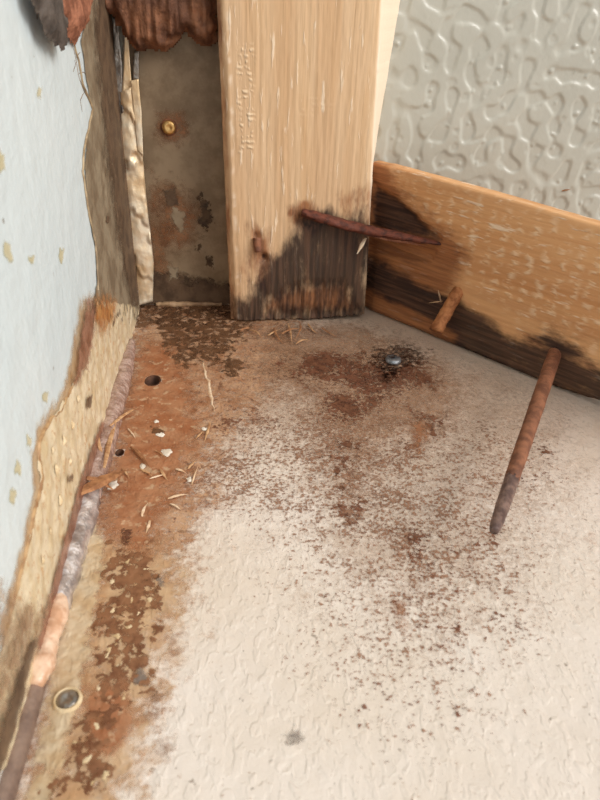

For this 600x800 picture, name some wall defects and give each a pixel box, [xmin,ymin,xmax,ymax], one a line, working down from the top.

peeling [0,301,140,771]
corrosion [68,297,116,384]
peeling [26,528,164,800]
water stain [23,0,317,800]
corrosion [174,324,576,747]